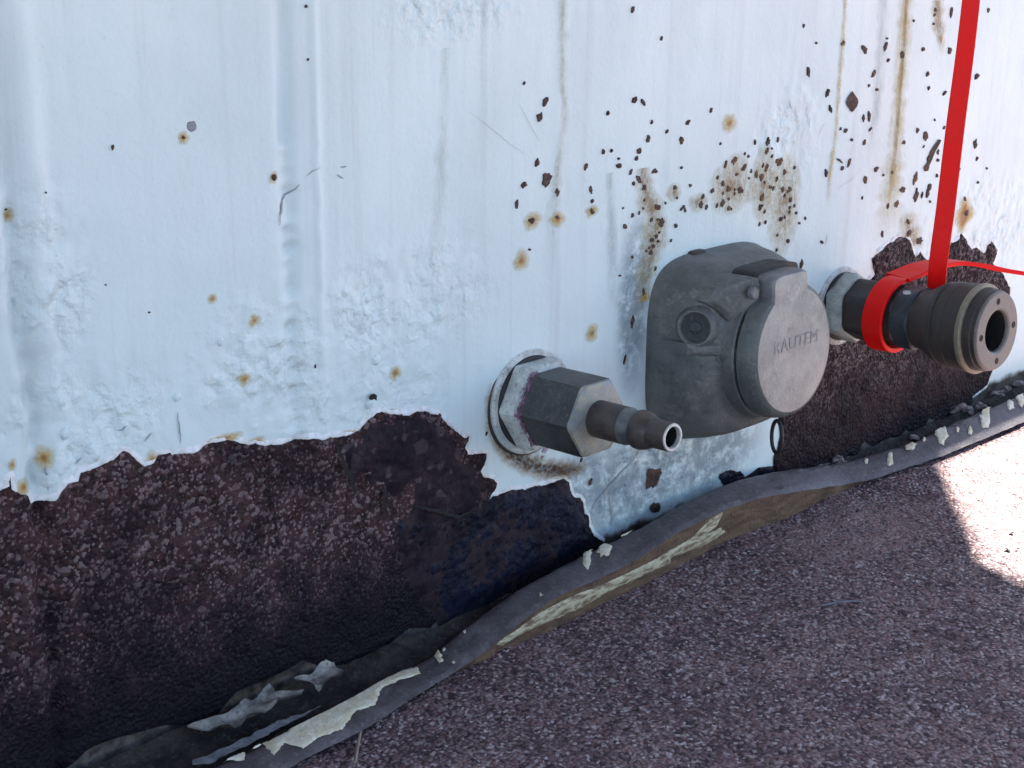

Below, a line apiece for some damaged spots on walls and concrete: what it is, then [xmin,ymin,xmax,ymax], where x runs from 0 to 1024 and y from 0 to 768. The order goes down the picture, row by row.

rust [934,0,943,43]
rust [895,0,908,149]
peeling [602,120,692,271]
peeling [699,137,806,252]
rust [889,162,897,202]
rust [958,201,972,230]
peeling [866,219,930,281]
peeling [946,230,1011,296]
peeling [719,340,993,486]
rust [37,451,51,464]
rust [495,442,582,478]
peeling [0,406,606,768]